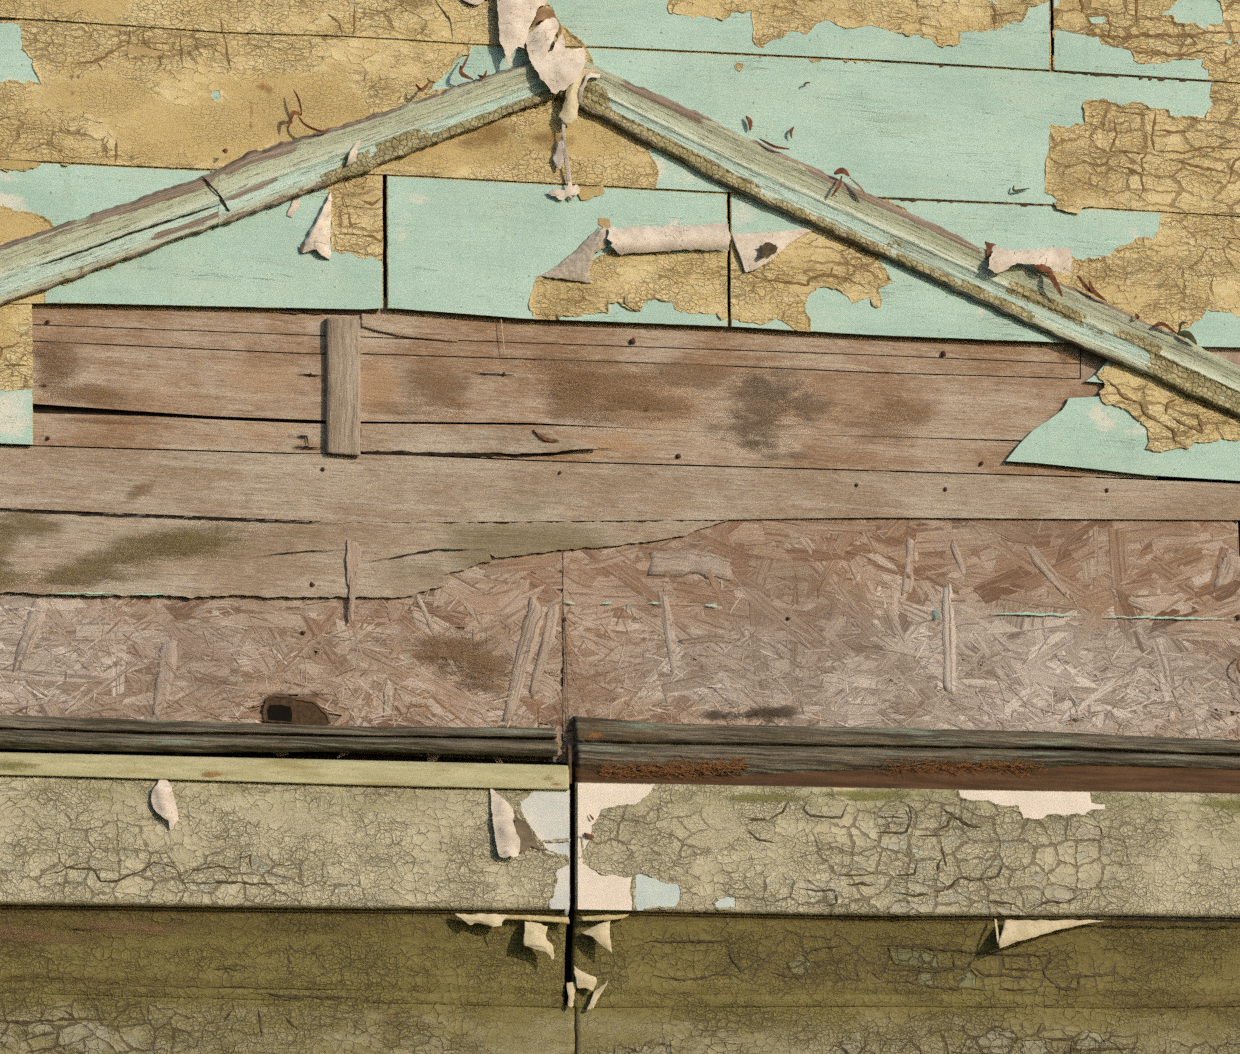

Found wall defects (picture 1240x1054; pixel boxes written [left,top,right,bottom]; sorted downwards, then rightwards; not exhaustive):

crack [436,1,453,40]
peeling [425,0,1214,272]
peeling [0,162,216,228]
peeling [43,146,823,319]
peeling [555,255,1071,343]
crack [18,855,289,885]
peeling [490,783,684,924]
crack [747,800,848,843]
crack [795,802,1084,911]
peeling [957,790,1108,841]
crack [0,1010,114,1053]
crack [572,1006,580,1054]